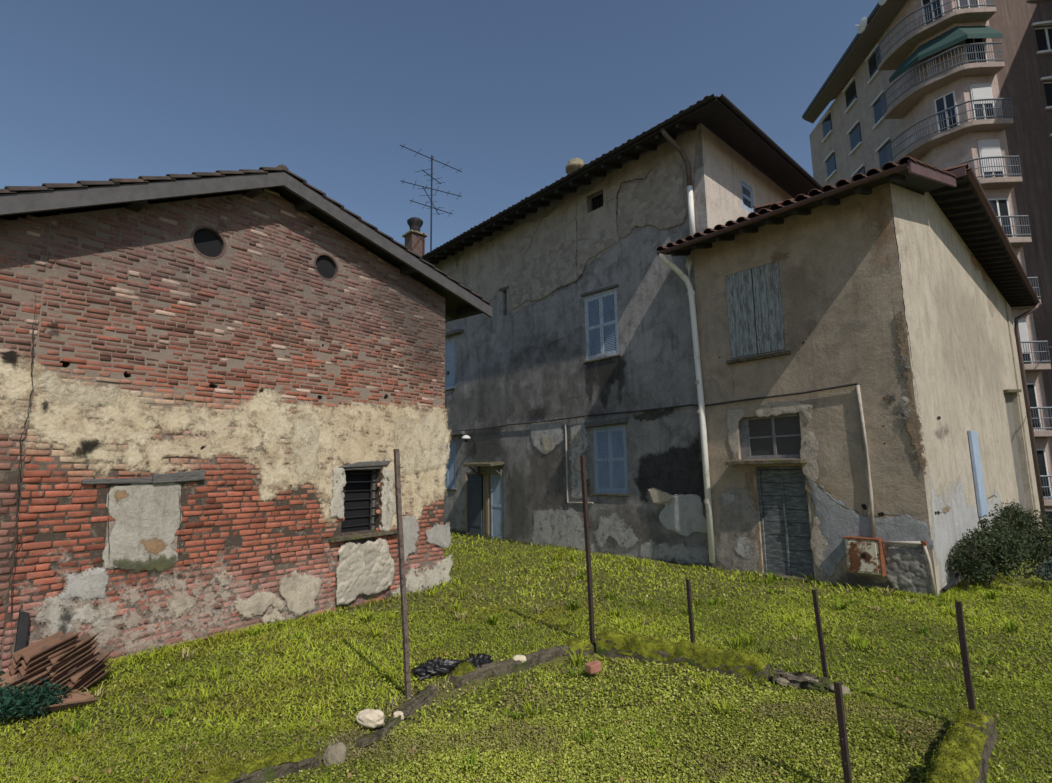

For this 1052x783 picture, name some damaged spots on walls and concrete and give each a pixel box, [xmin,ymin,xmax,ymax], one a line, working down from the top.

water stain [511,342,626,419]
crack [10,285,36,653]
peeling [0,350,456,597]
peeling [530,420,589,499]
peeling [35,592,117,636]
peeling [166,591,201,618]
peeling [215,569,323,624]